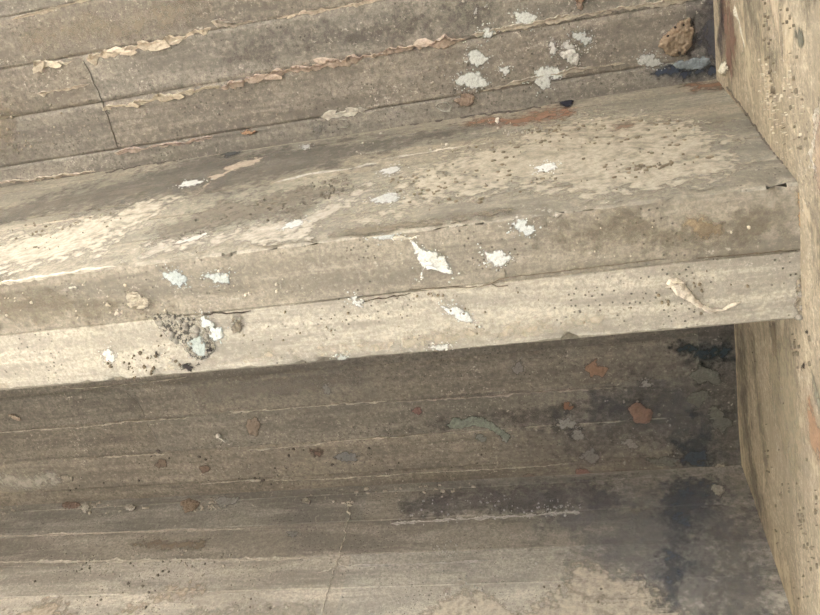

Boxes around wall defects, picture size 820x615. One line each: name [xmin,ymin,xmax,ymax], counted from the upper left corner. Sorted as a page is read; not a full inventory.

peeling [105,46,137,56]
peeling [146,39,182,51]
peeling [32,61,62,74]
peeling [249,74,282,83]
peeling [160,89,194,102]
corrosion [466,105,576,128]
spalling [123,291,216,380]
damp [668,338,736,432]
damp [646,432,715,467]
damp [419,476,783,615]